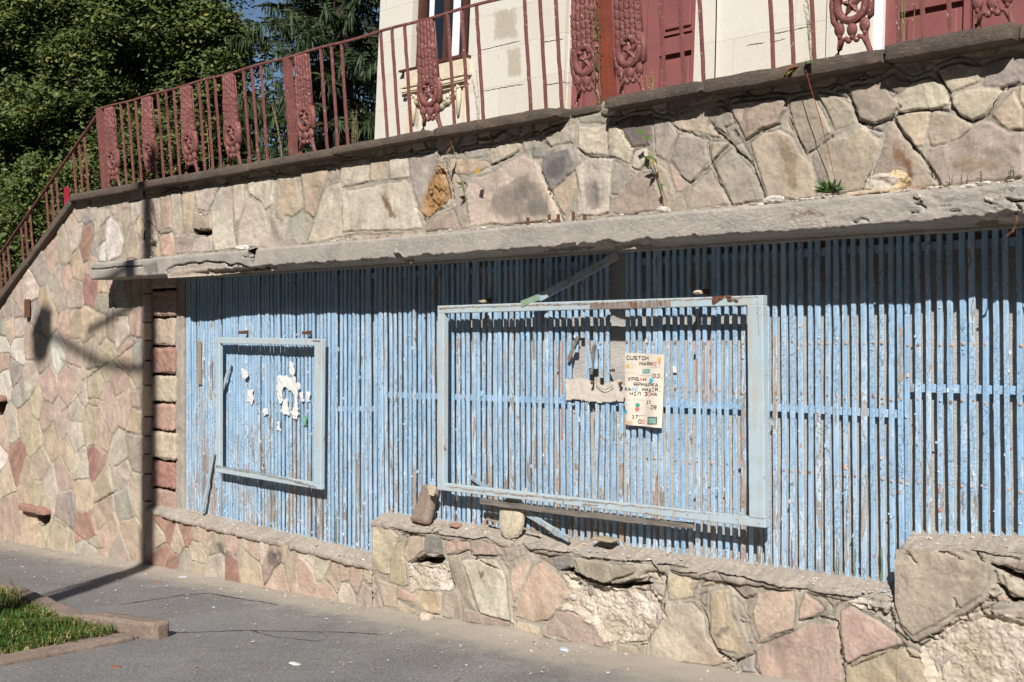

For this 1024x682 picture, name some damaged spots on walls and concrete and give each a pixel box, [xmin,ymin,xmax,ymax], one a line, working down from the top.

peeling [167,248,278,278]
corrosion [674,295,748,305]
peeling [772,335,884,431]
peeling [882,316,988,382]
peeling [191,379,376,540]
peeling [766,491,826,568]
peeling [835,508,907,581]
peeling [880,457,1023,531]